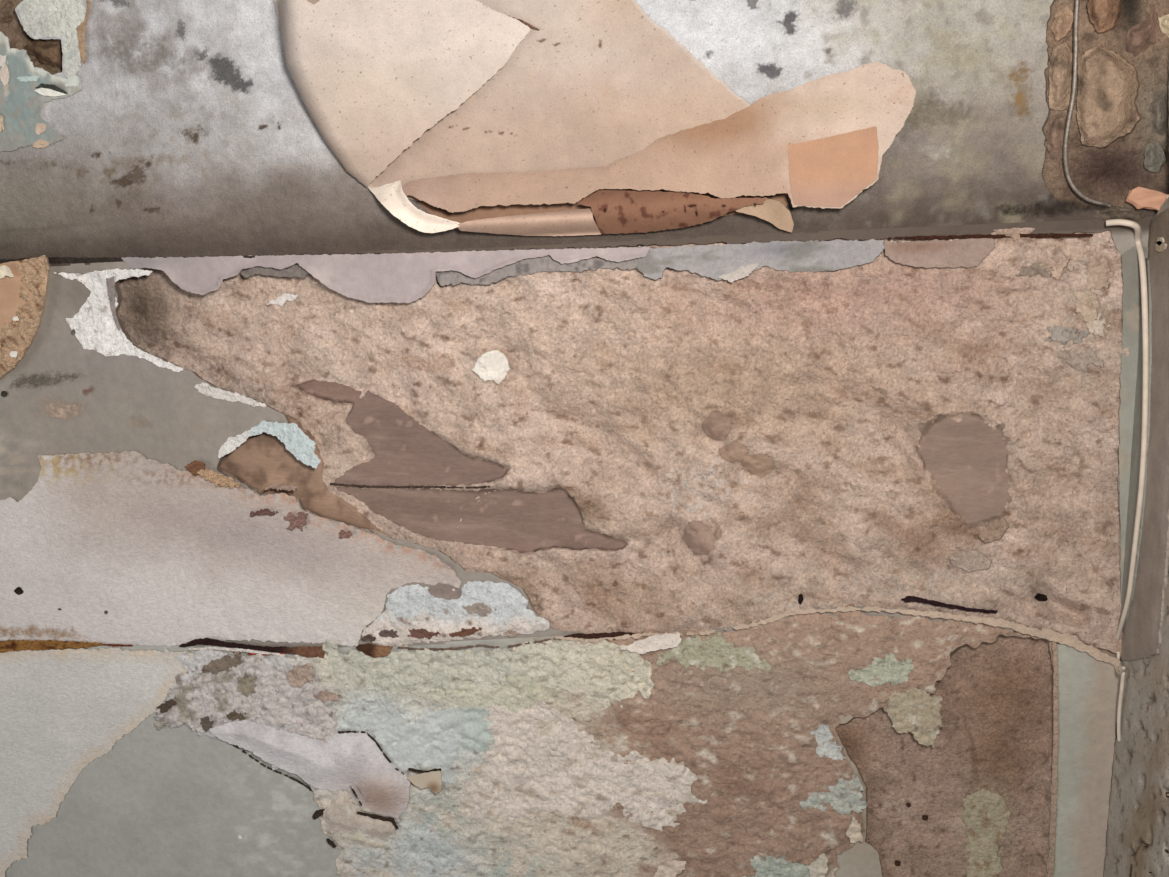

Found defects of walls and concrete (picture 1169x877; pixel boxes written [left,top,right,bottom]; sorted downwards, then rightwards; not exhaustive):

spalling [1043,0,1169,209]
spalling [54,228,1130,877]
crack [901,596,998,614]